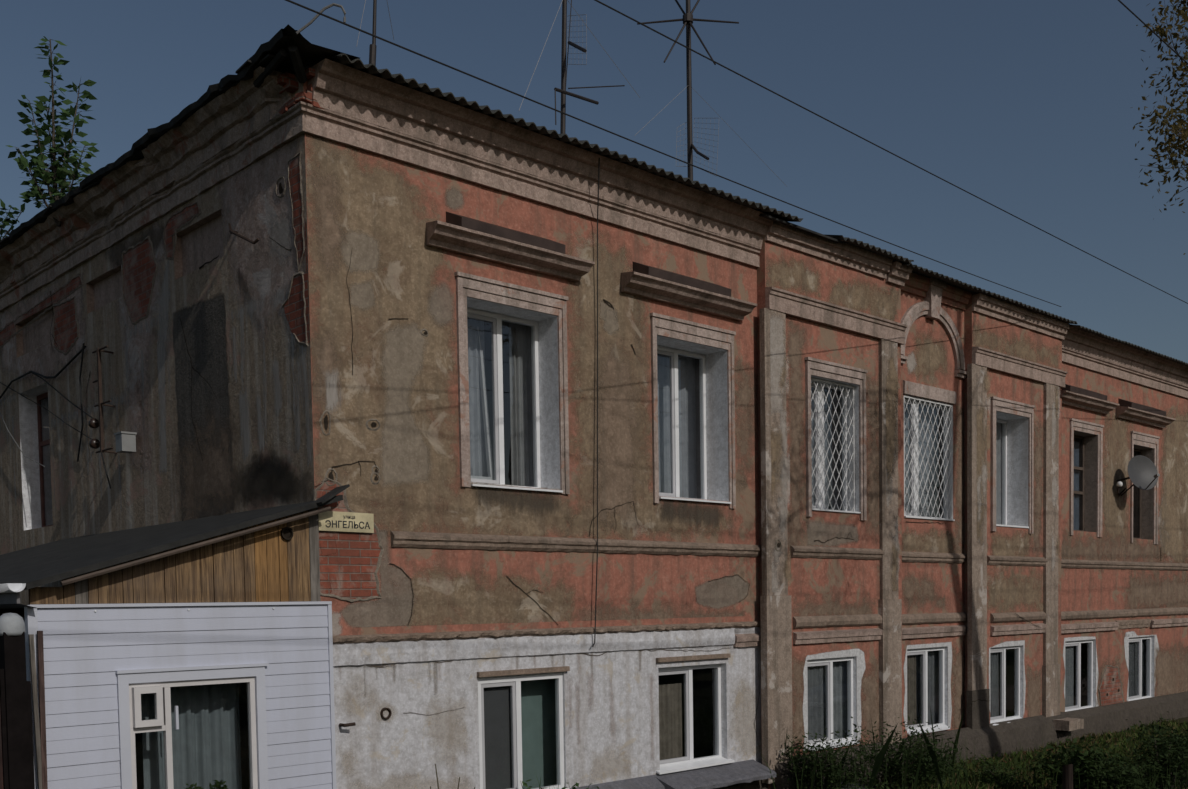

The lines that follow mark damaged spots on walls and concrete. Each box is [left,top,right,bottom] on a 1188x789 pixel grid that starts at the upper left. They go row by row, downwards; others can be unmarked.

flaking render [0,274,85,384]
peeling [218,137,744,636]
crack [507,576,558,625]